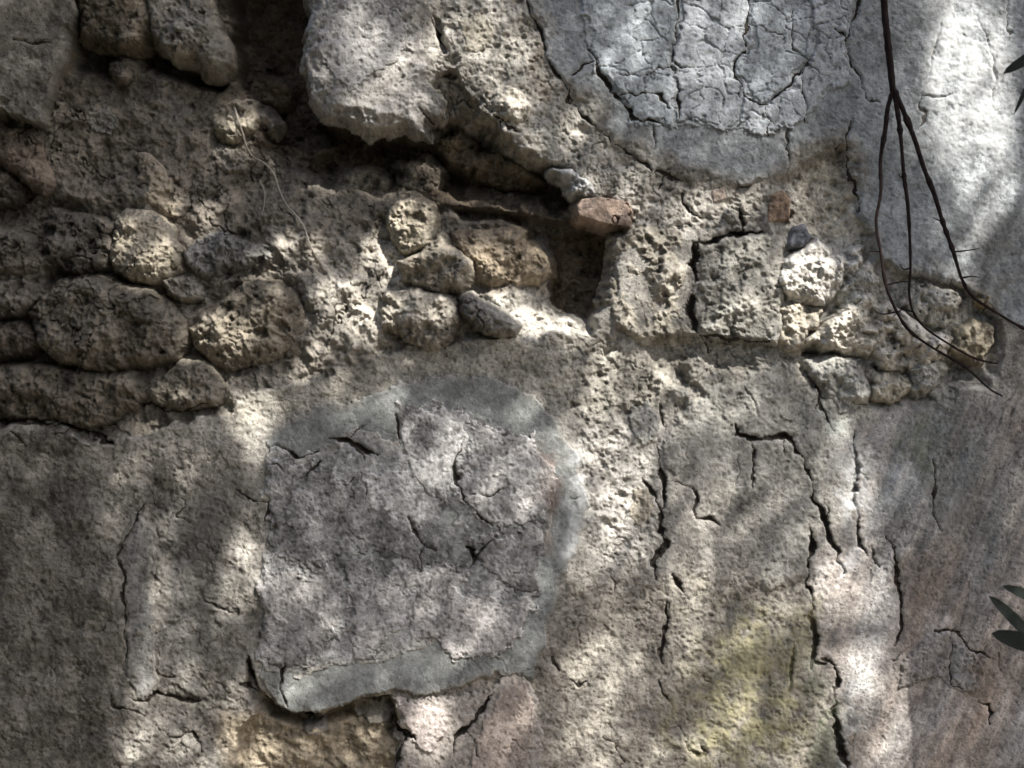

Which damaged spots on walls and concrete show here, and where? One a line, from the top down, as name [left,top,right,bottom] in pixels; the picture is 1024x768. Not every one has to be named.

crack [733,0,809,169]
crack [834,0,878,102]
crack [526,0,770,357]
spalling [228,369,338,411]
crack [268,413,401,499]
crack [407,516,436,572]
crack [452,441,504,567]
crack [642,403,721,700]
crack [735,381,912,768]
crack [934,628,994,725]